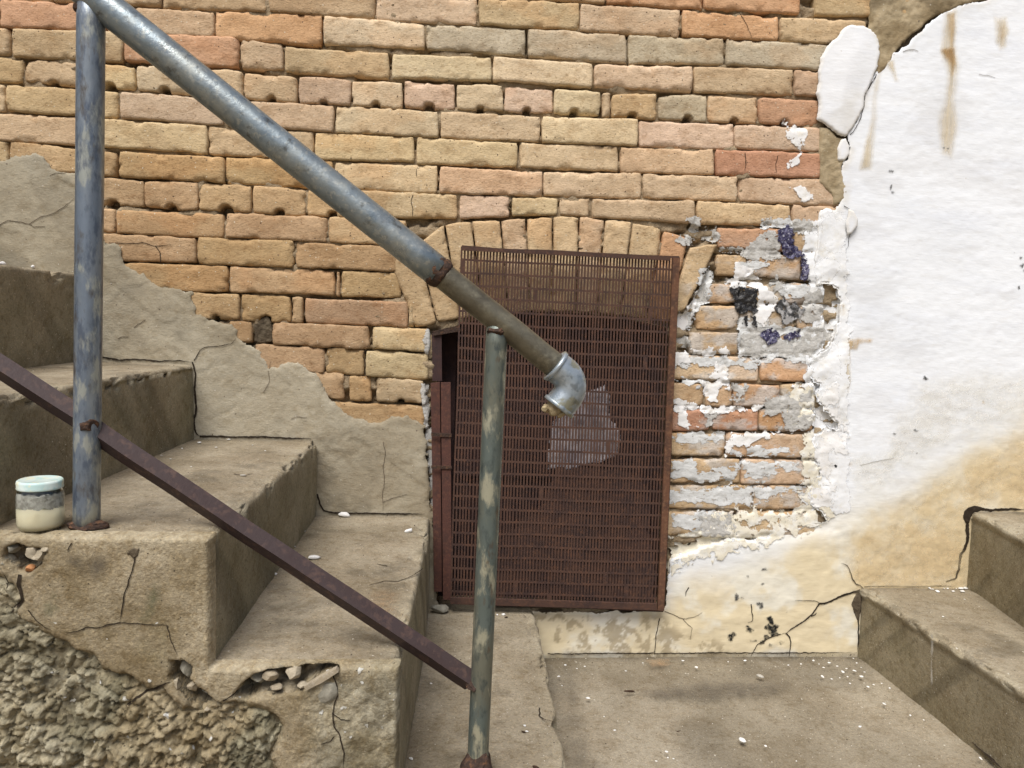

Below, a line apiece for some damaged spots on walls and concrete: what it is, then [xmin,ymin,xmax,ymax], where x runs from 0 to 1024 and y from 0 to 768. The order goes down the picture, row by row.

crack [102,322,311,439]
spalling [254,316,272,343]
peeling [666,119,858,576]
crack [4,557,177,654]
spalling [0,543,340,768]
leakage [746,602,778,644]
crack [548,507,1024,657]
crack [322,676,350,765]